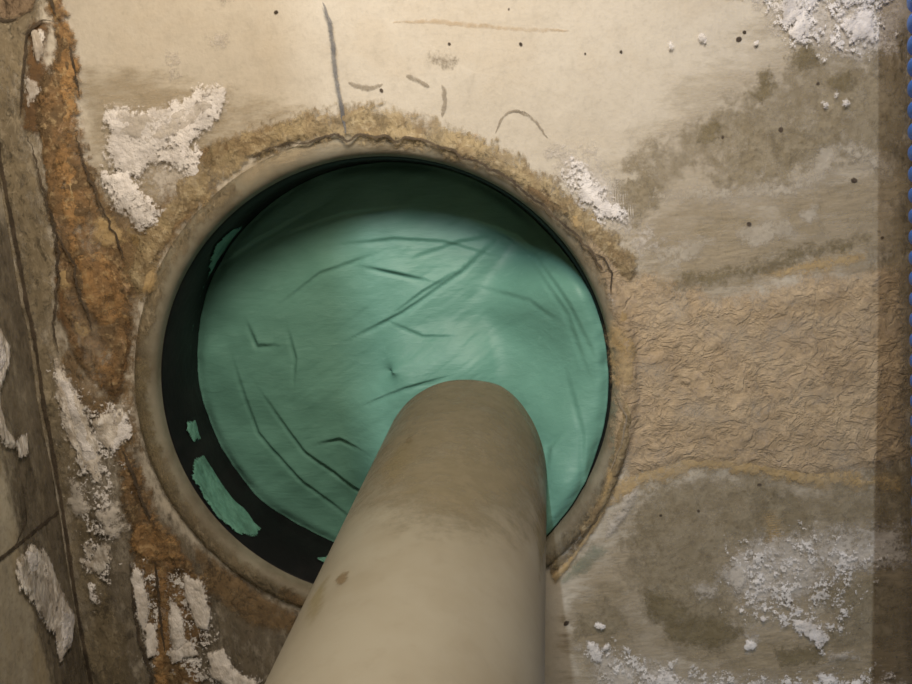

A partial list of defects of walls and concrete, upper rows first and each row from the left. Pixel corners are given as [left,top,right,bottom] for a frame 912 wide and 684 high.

crack [253,3,613,292]
corrosion [22,0,298,684]
water stain [366,380,547,521]